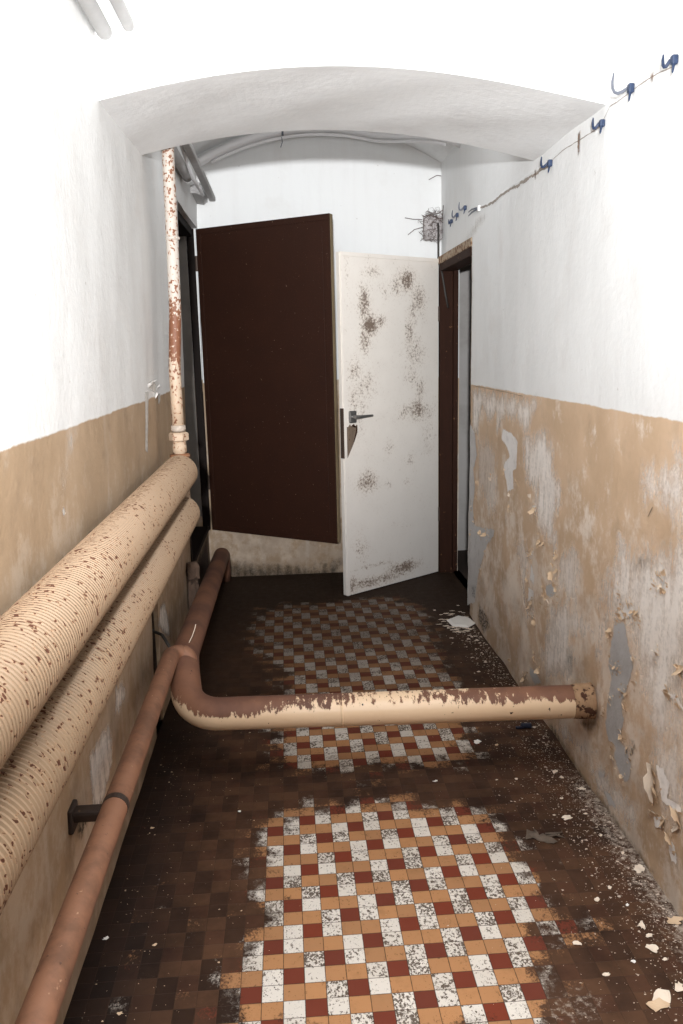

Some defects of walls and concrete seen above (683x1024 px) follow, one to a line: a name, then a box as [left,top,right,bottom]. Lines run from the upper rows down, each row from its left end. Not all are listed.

peeling [467,377,536,605]
peeling [650,562,668,597]
peeling [600,583,641,782]
peeling [660,664,683,711]
peeling [643,761,682,865]